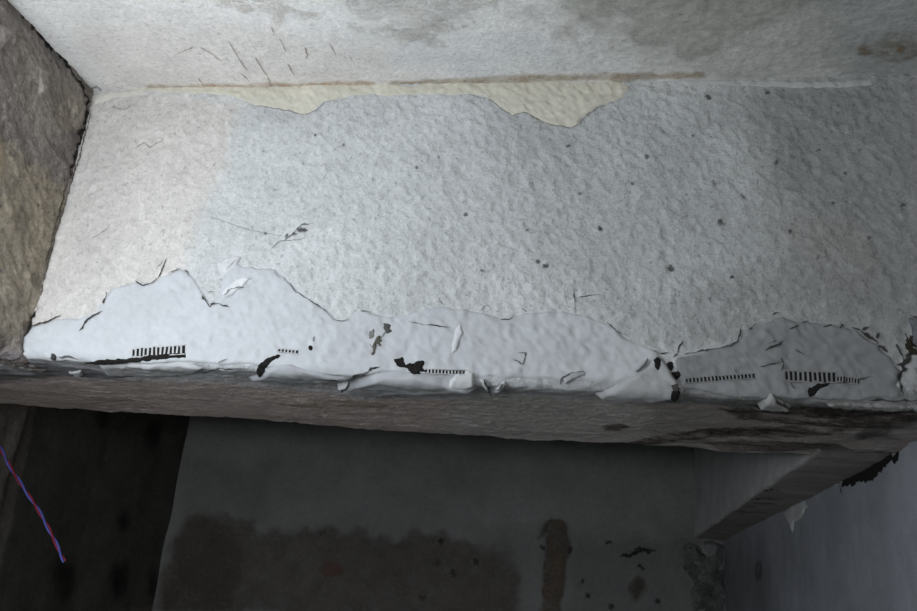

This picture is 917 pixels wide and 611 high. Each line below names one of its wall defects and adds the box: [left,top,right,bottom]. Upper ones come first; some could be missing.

flaking render [92,81,629,128]
spalling [905,315,917,355]
peeling [99,363,202,377]
peeling [449,370,475,390]
damp [631,405,917,452]
spalling [826,400,917,412]
damp [152,516,519,611]
damp [539,520,570,611]
flaking render [678,541,725,611]